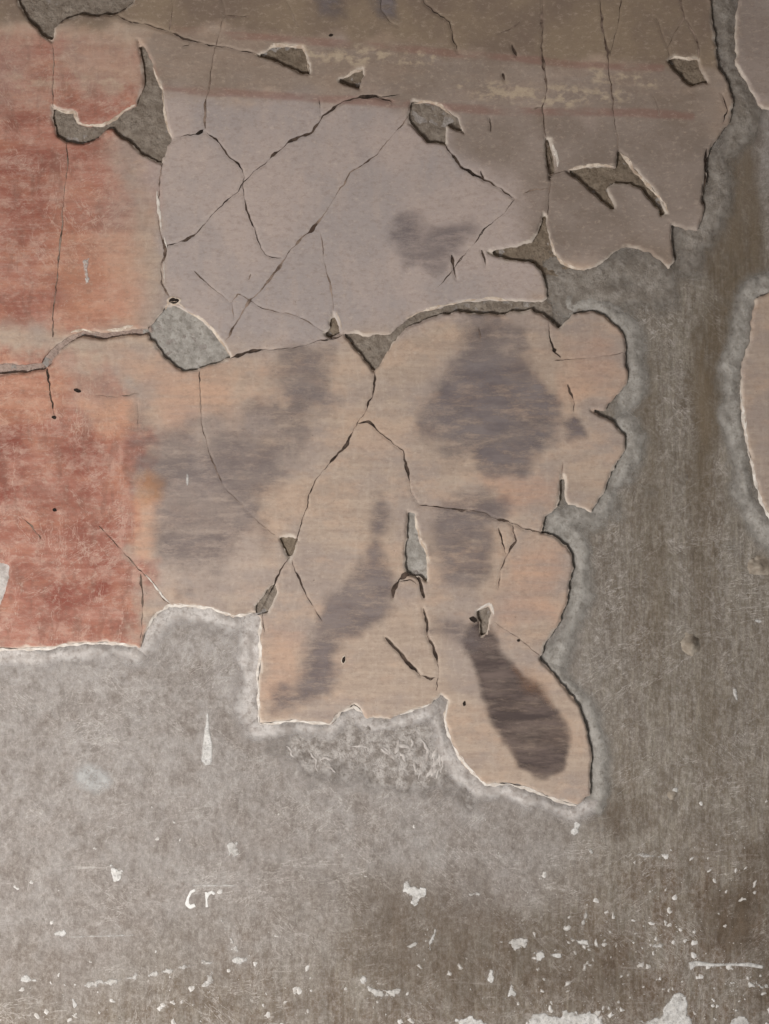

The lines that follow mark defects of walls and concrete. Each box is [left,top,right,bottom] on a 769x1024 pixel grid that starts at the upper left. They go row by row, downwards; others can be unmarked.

flaking render [53,46,172,163]
crack [117,0,409,359]
crack [440,5,564,285]
flaking render [569,152,668,216]
flaking render [492,217,583,279]
flaking render [0,296,230,374]
flaking render [326,297,554,371]
water stain [432,352,557,472]
crack [199,371,541,632]
water stain [275,544,391,706]
crack [385,572,438,690]
water stain [465,622,568,776]